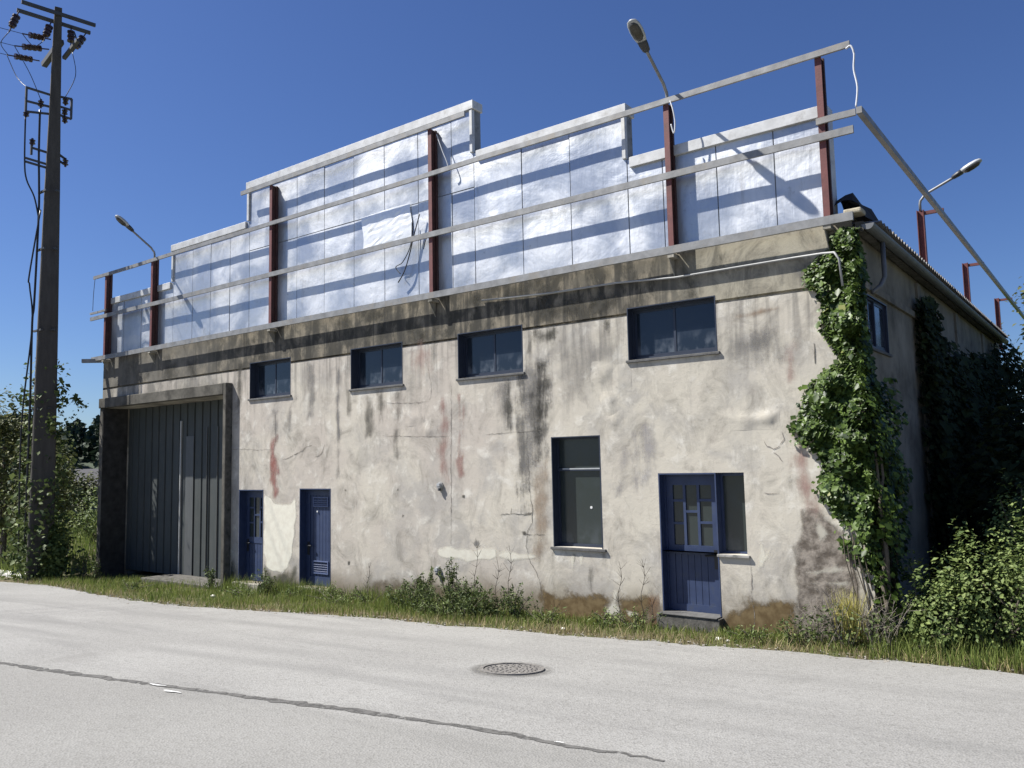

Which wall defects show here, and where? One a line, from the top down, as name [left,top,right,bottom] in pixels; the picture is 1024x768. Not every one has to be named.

water stain [538,300,609,340]
water stain [520,364,544,469]
corrosion [270,440,279,497]
crack [485,430,544,599]
water stain [540,588,651,626]